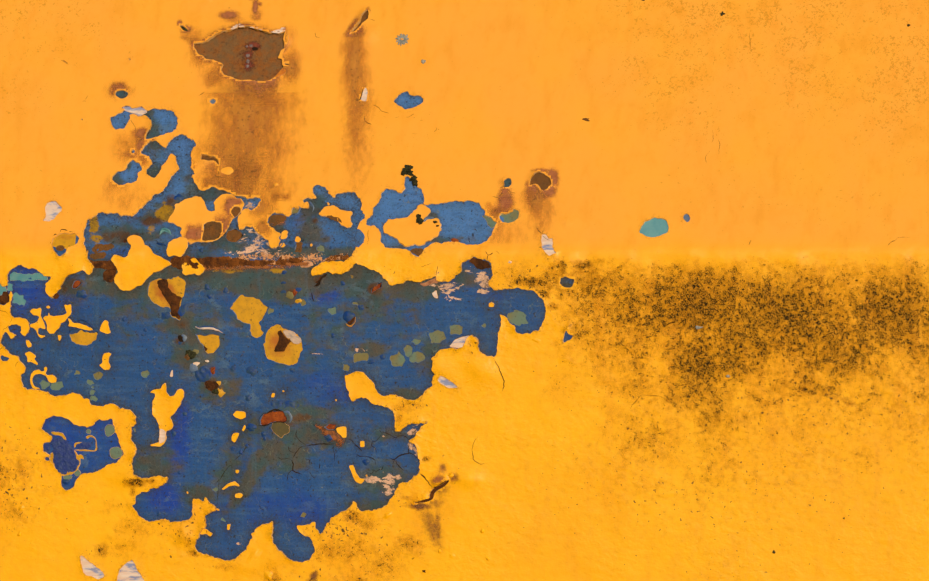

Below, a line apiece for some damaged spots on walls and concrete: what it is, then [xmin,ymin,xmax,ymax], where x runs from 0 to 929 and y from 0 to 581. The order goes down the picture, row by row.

corrosion [220,0,261,30]
spalling [194,24,289,81]
corrosion [346,19,366,141]
corrosion [177,21,297,234]
corrosion [491,188,513,220]
corrosion [526,169,558,216]
peeling [639,218,668,237]
peeling [0,91,546,562]
mould [510,257,929,485]
crack [278,426,421,479]
peeling [80,556,104,579]
peeling [117,561,144,581]